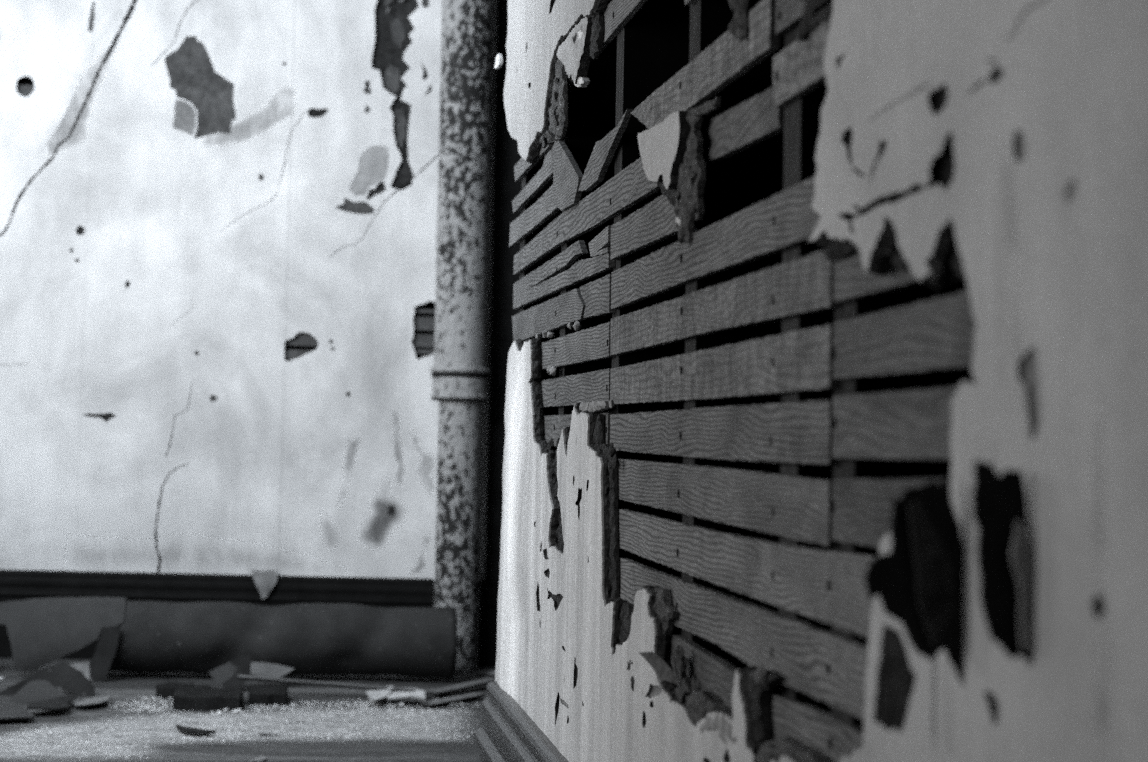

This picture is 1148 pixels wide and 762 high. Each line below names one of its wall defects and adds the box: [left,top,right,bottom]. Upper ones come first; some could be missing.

crack [0,0,137,236]
flaking render [165,36,236,139]
flaking render [335,0,432,214]
flaking render [520,0,611,164]
flaking render [284,332,335,361]
flaking render [411,301,435,359]
flaking render [808,215,907,276]
flaking render [921,218,967,289]
crack [155,385,192,573]
flaking render [511,330,570,627]
flaking render [574,400,863,762]
peeling [864,460,1036,733]